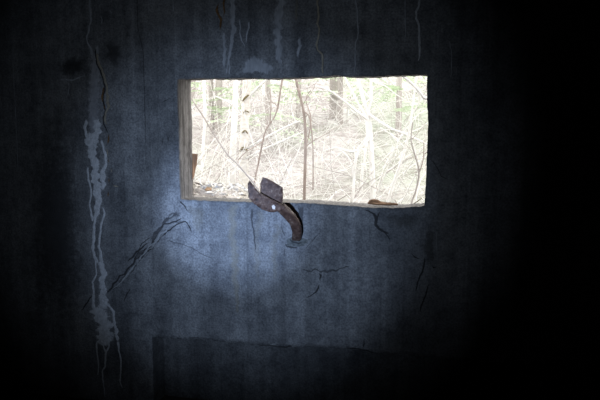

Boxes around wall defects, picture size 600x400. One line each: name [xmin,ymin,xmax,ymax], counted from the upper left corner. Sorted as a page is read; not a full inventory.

leakage [242,0,286,74]
crack [95,50,118,195]
leakage [83,0,123,396]
crack [108,201,211,300]
crack [299,235,349,298]
crack [366,210,390,240]